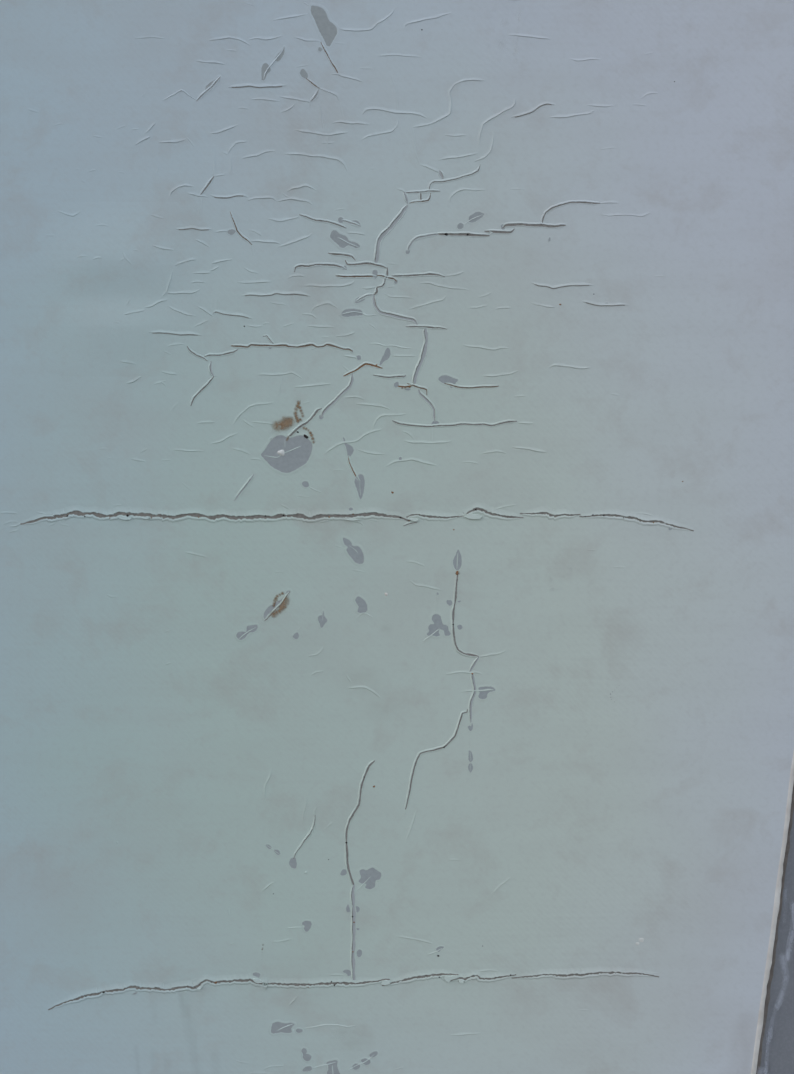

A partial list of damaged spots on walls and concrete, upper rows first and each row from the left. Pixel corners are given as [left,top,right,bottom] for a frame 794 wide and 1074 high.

peeling [303,2,340,49]
crack [124,8,650,481]
peeling [258,432,322,493]
crack [0,474,694,533]
peeling [423,599,464,642]
crack [403,571,506,818]
crack [47,760,660,1011]
peeling [339,865,384,892]
peeling [268,1019,379,1074]